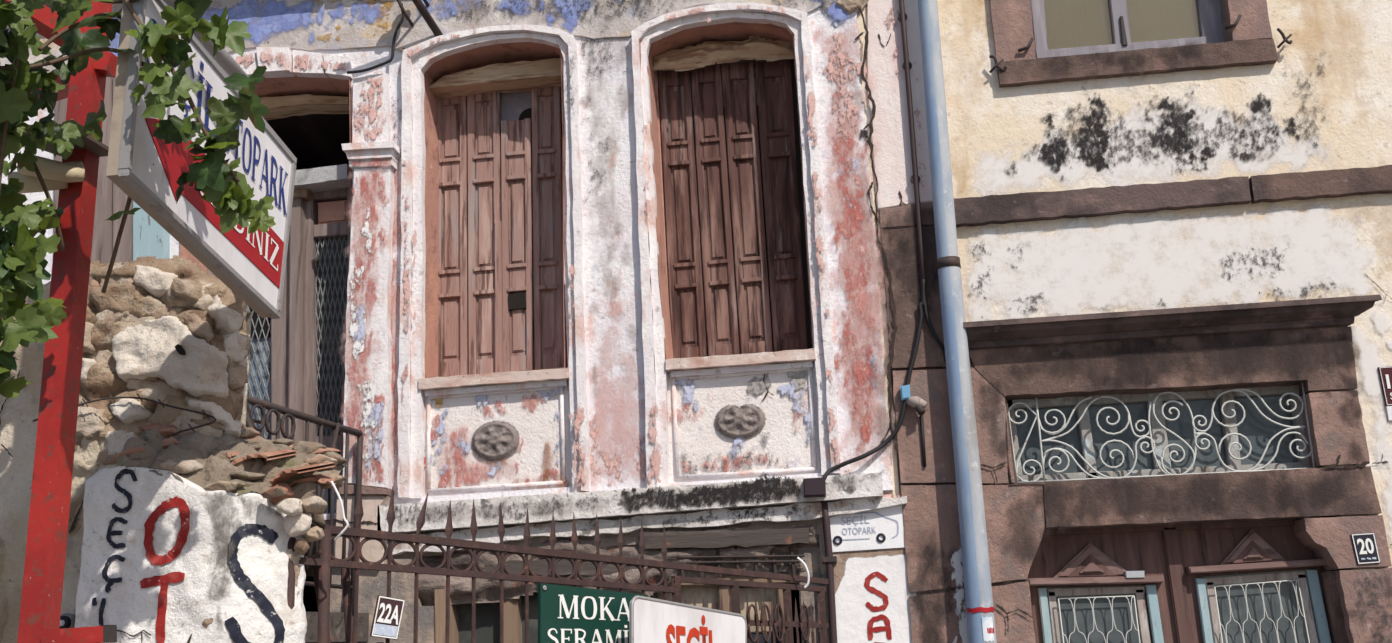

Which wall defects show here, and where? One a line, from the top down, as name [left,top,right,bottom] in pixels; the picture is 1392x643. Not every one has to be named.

peeling [408,0,592,57]
peeling [354,77,385,140]
leakage [1005,53,1331,181]
peeling [746,0,890,493]
crack [854,8,906,454]
peeling [346,158,417,482]
crack [0,370,20,457]
peeling [424,335,713,488]
leakage [394,432,800,530]
peeling [680,437,768,472]